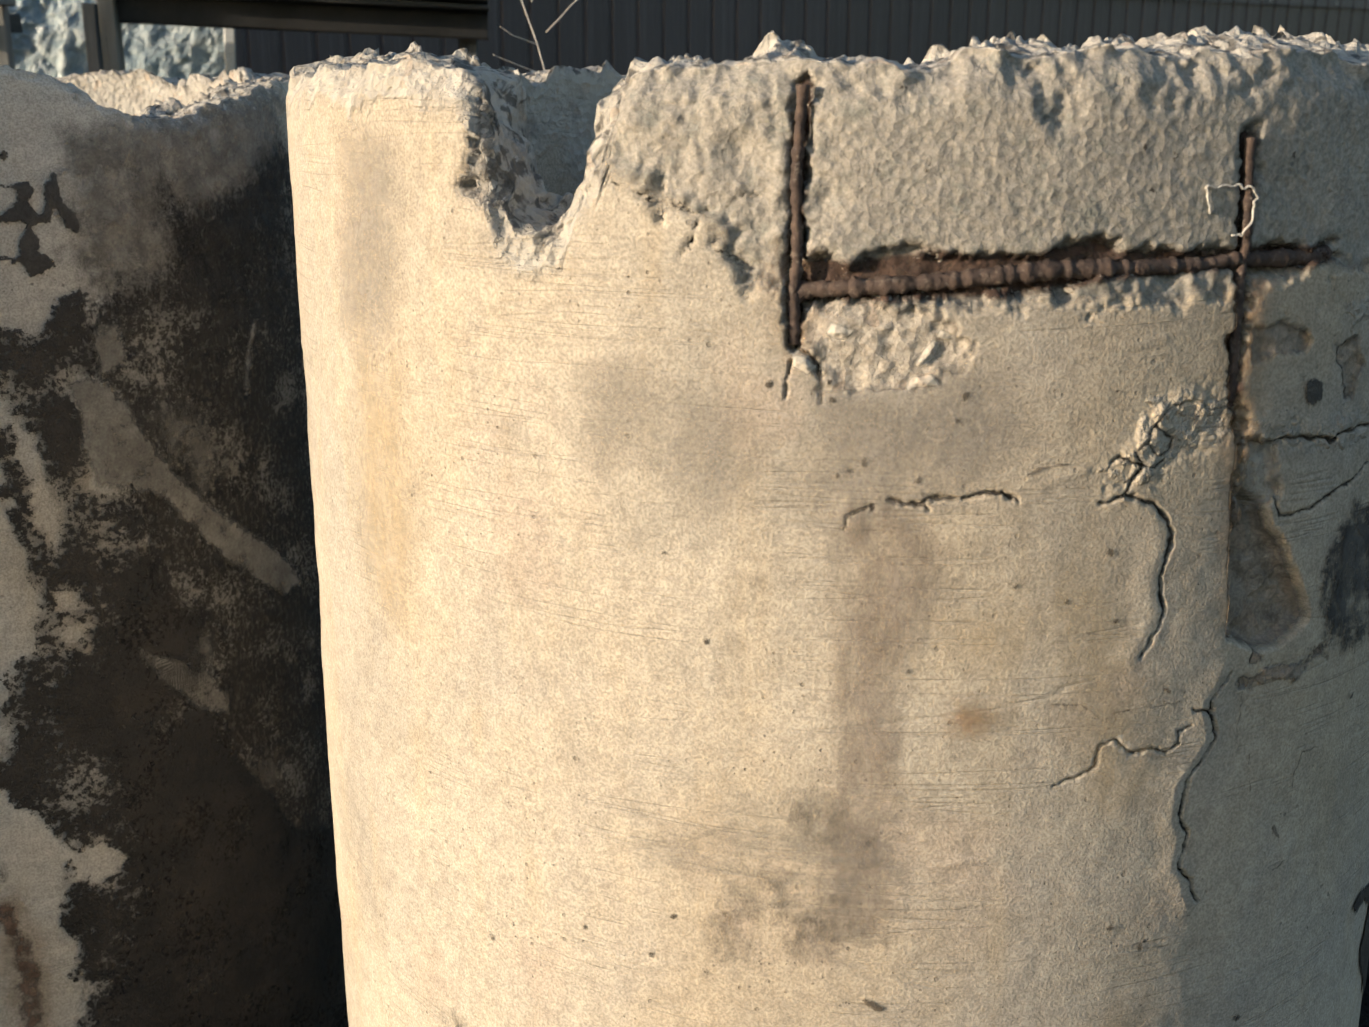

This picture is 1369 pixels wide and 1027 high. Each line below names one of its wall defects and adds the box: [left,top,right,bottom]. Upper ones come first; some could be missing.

spalling [463,84,514,207]
spalling [606,45,1369,288]
crack [843,464,1069,528]
spalling [792,266,1290,403]
crack [1098,403,1222,656]
spalling [1224,494,1325,688]
spalling [1247,321,1310,362]
crack [1239,423,1369,446]
peeling [1306,378,1323,405]
crack [1273,461,1368,517]
crack [1054,685,1251,902]
rust [0,904,44,1027]